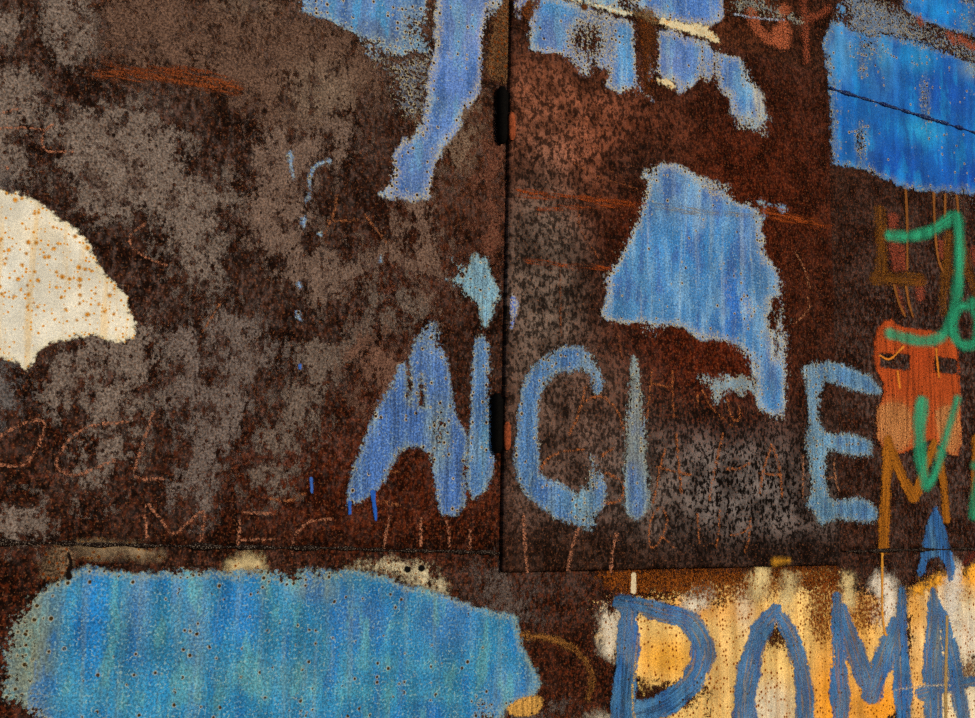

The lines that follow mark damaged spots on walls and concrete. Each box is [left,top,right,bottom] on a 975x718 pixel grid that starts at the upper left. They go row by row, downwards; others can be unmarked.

peeling [571,0,633,16]
peeling [729,0,808,25]
rust [486,0,541,84]
rust [633,7,659,94]
peeling [659,17,720,43]
peeling [842,0,975,60]
rust [93,62,244,96]
rust [517,189,646,211]
rust [761,204,824,226]
rust [55,265,116,321]
rust [37,544,75,582]